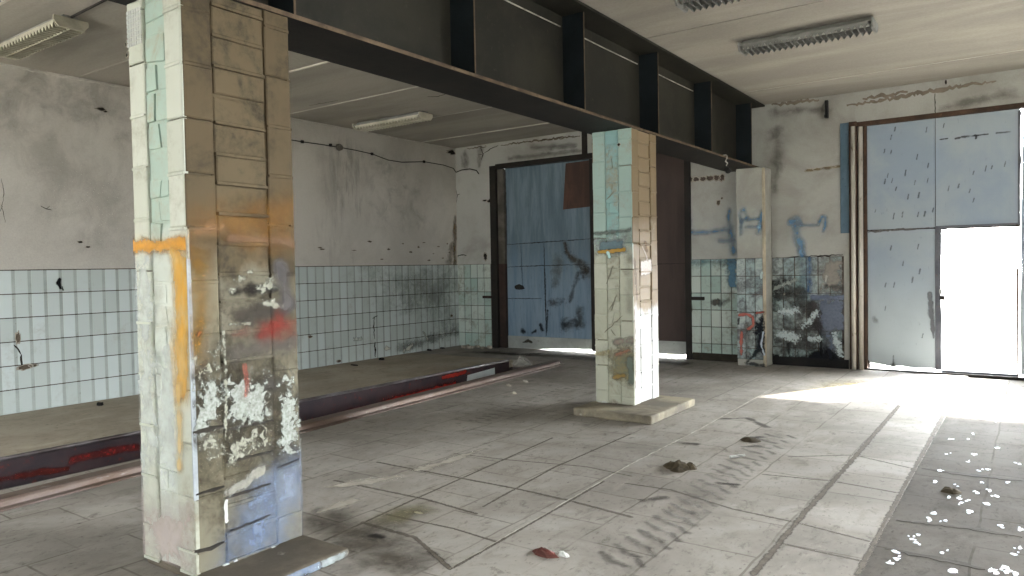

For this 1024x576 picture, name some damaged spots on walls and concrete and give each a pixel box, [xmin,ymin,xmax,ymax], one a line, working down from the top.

spalling [847,80,996,106]
peeling [256,275,284,309]
peeling [191,321,528,523]
spalling [0,430,142,490]